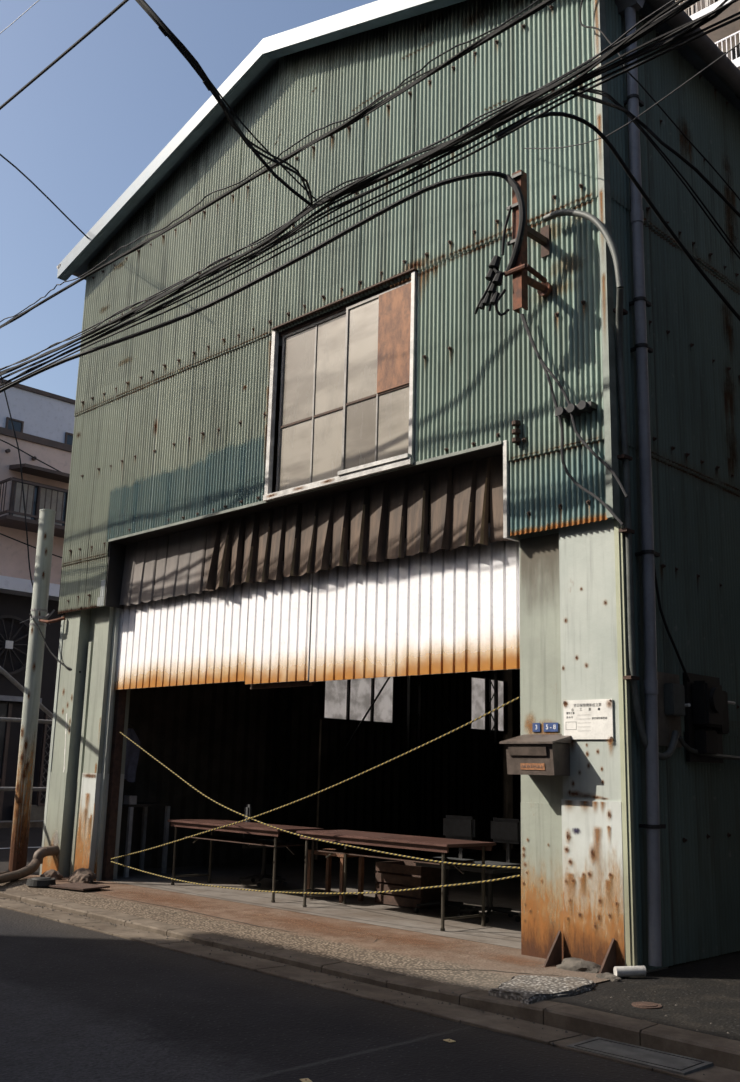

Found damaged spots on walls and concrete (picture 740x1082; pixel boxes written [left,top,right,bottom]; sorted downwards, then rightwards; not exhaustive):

corrosion [114,648,520,690]
corrosion [525,718,558,734]
corrosion [8,729,34,872]
corrosion [42,855,59,874]
corrosion [74,793,97,881]
corrosion [502,832,625,978]
corrosion [566,739,612,859]